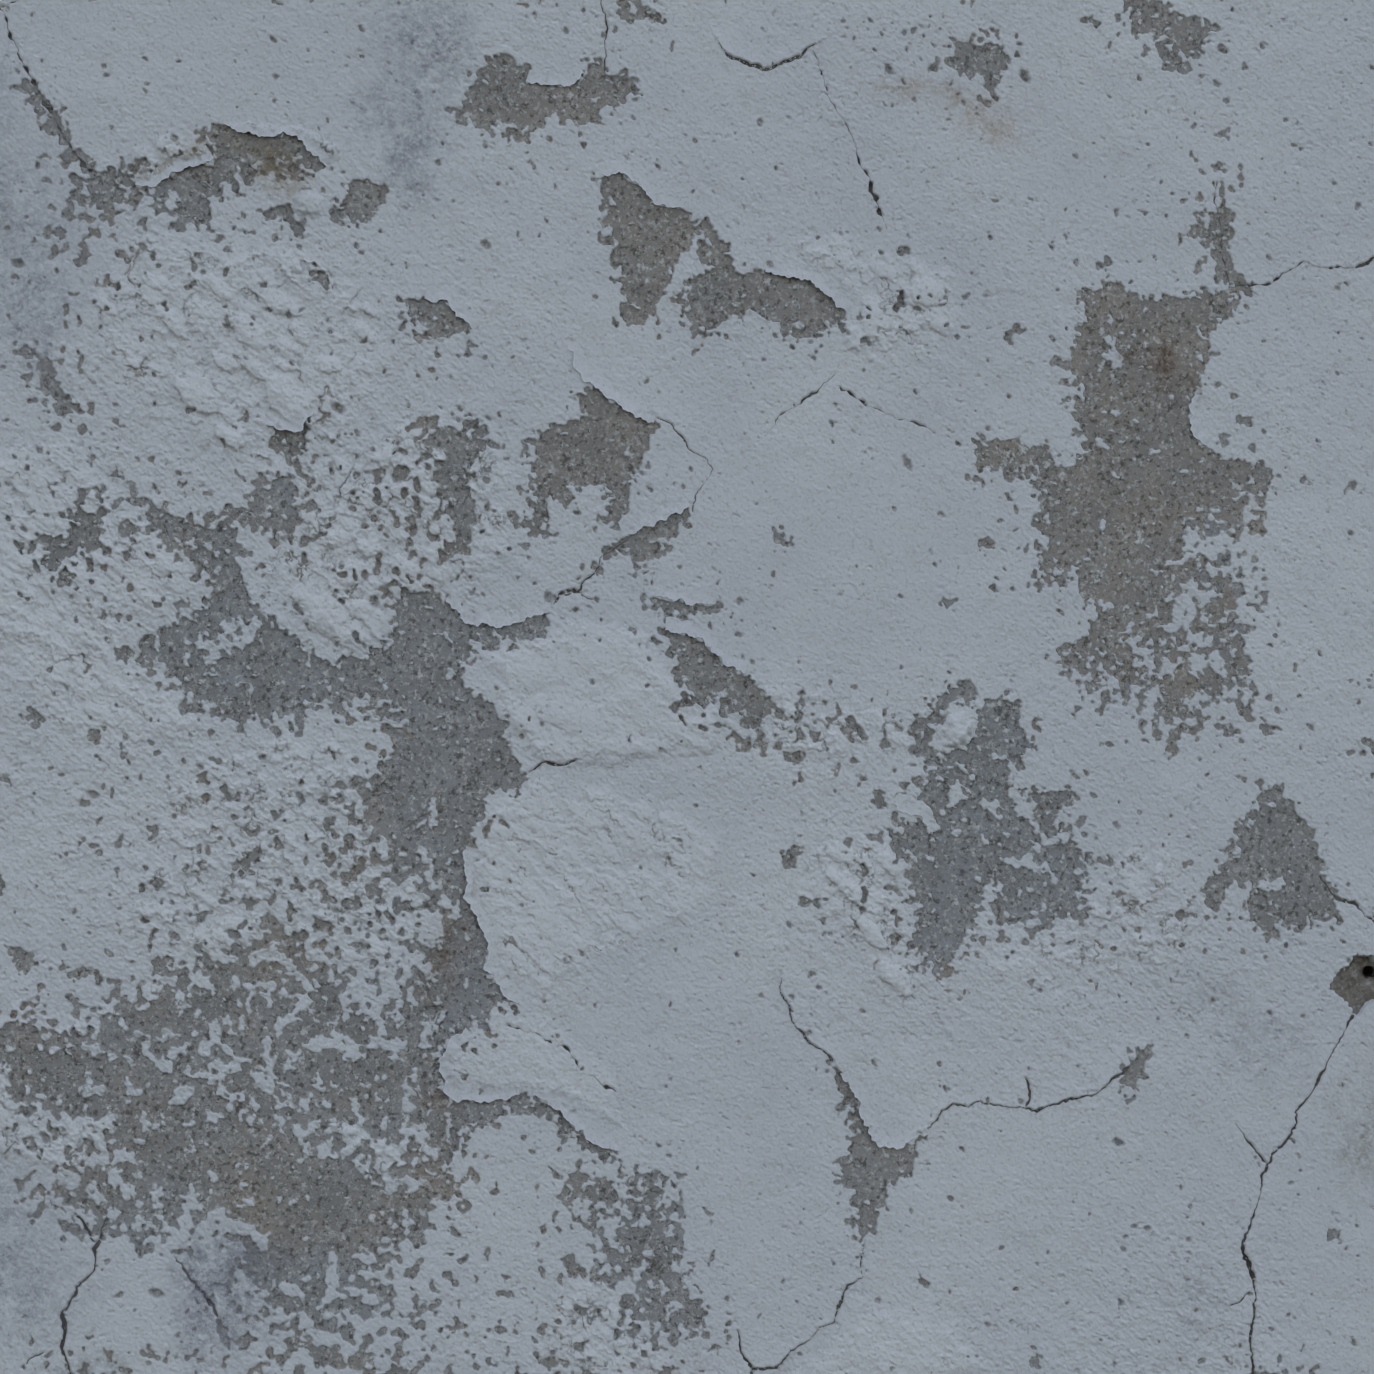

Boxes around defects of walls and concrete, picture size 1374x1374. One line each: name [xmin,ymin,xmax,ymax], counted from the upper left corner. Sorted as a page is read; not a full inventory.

peeling [456,55,642,144]
peeling [599,156,853,339]
peeling [521,335,690,575]
peeling [971,218,1269,723]
peeling [129,475,623,1208]
peeling [870,681,1088,976]
peeling [1200,784,1343,933]
crack [1319,875,1374,922]
crack [779,981,833,1062]
crack [927,1067,1129,1129]
crack [1230,1014,1354,1374]
crack [738,1248,864,1374]